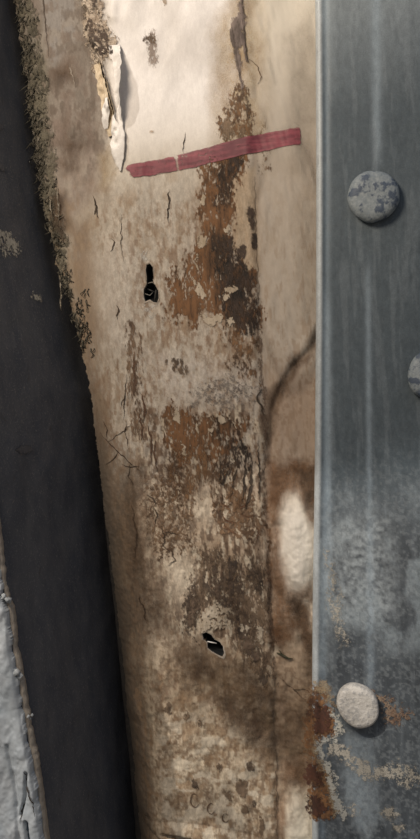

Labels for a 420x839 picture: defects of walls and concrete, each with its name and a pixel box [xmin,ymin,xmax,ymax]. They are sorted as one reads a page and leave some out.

peeling [82,0,125,171]
crack [230,0,262,89]
peeling [160,154,267,386]
water stain [187,355,310,445]
peeling [140,398,270,688]
corrosion [302,680,420,822]